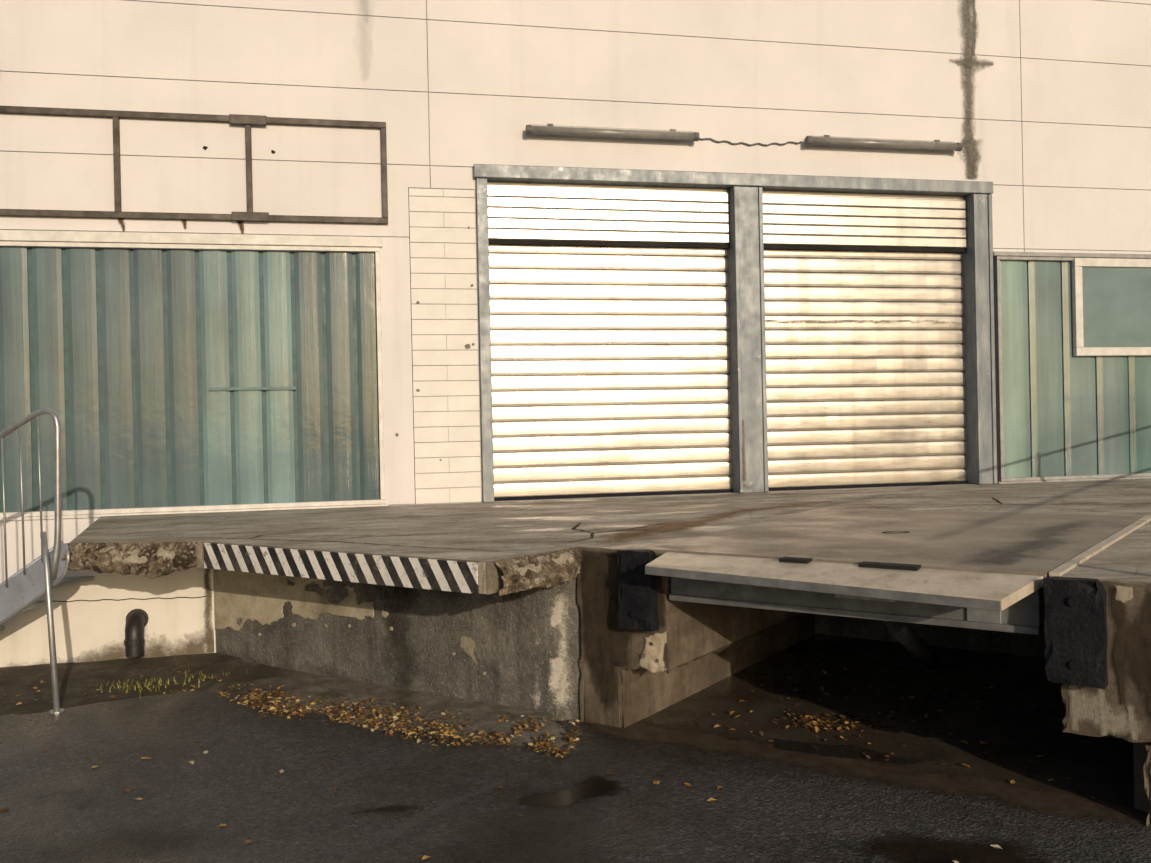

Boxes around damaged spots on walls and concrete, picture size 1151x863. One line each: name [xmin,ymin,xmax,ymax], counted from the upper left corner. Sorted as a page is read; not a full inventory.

spalling [61,542,197,579]
flaking render [213,569,393,636]
damp [384,587,413,688]
spalling [494,548,582,596]
damp [531,594,571,707]
damp [581,551,635,706]
spalling [639,631,667,673]
damp [1070,588,1151,740]